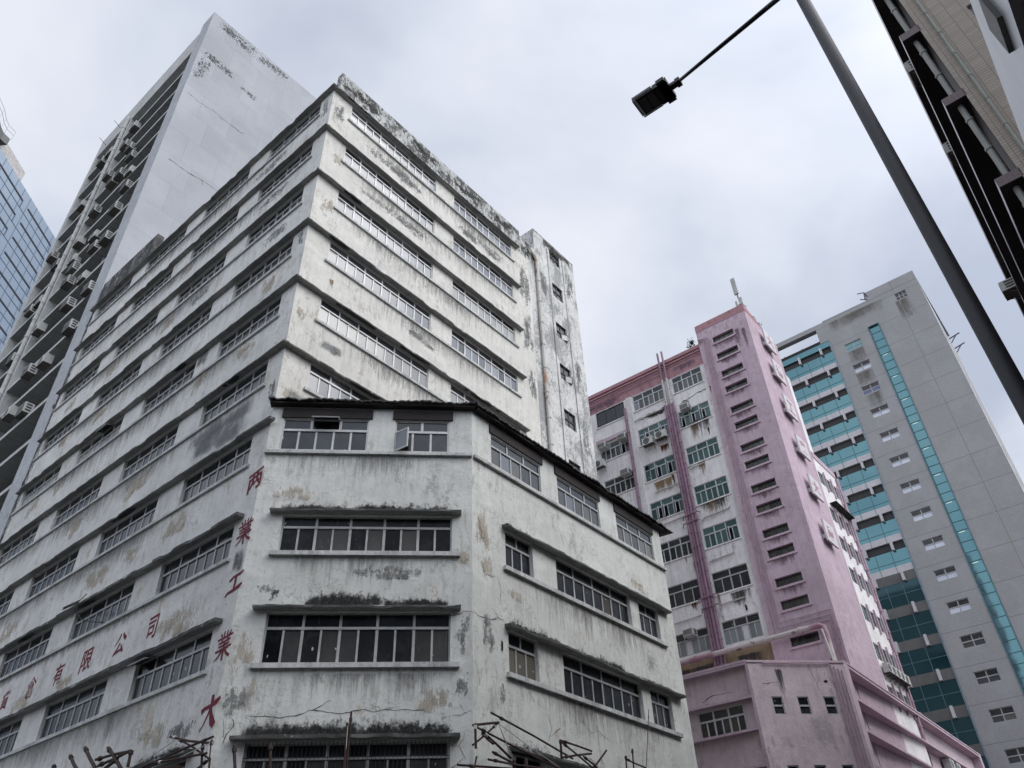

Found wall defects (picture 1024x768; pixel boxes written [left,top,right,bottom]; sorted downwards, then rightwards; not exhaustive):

leakage [346,85,381,117]
leakage [413,139,439,164]
leakage [195,403,247,455]
corrosion [654,474,675,491]
flaking render [353,566,421,580]
crack [223,700,422,743]